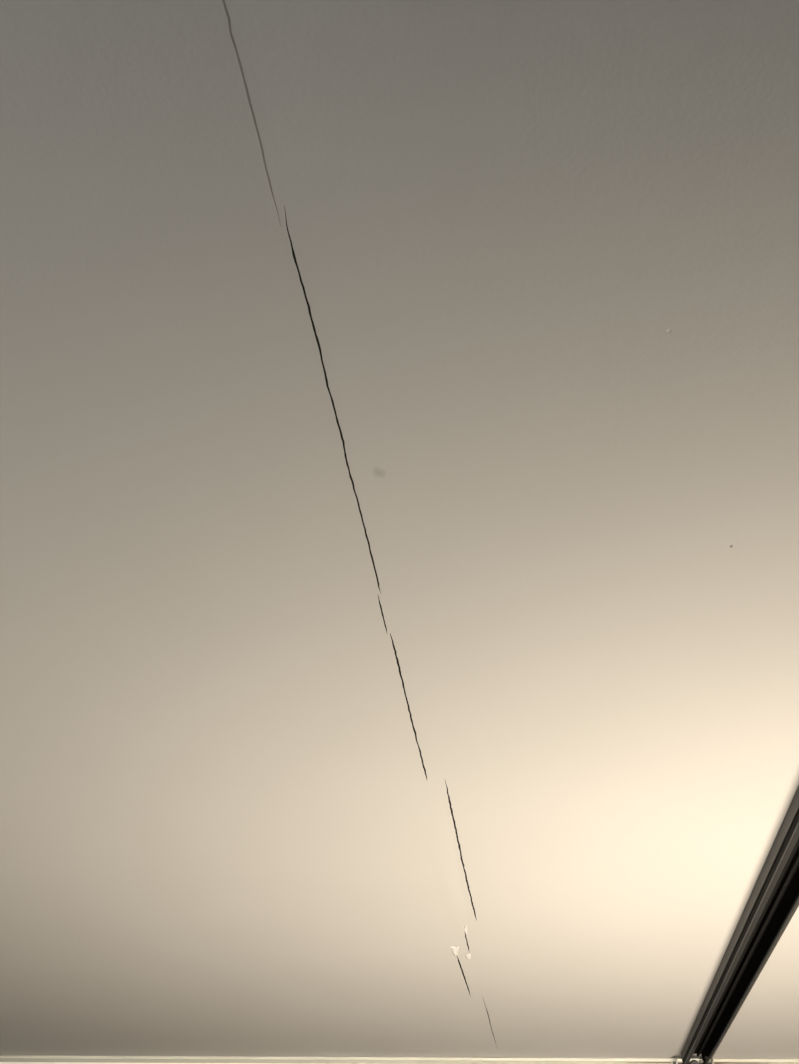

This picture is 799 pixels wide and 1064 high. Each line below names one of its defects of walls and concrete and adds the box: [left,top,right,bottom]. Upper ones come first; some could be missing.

crack [222,0,498,1049]